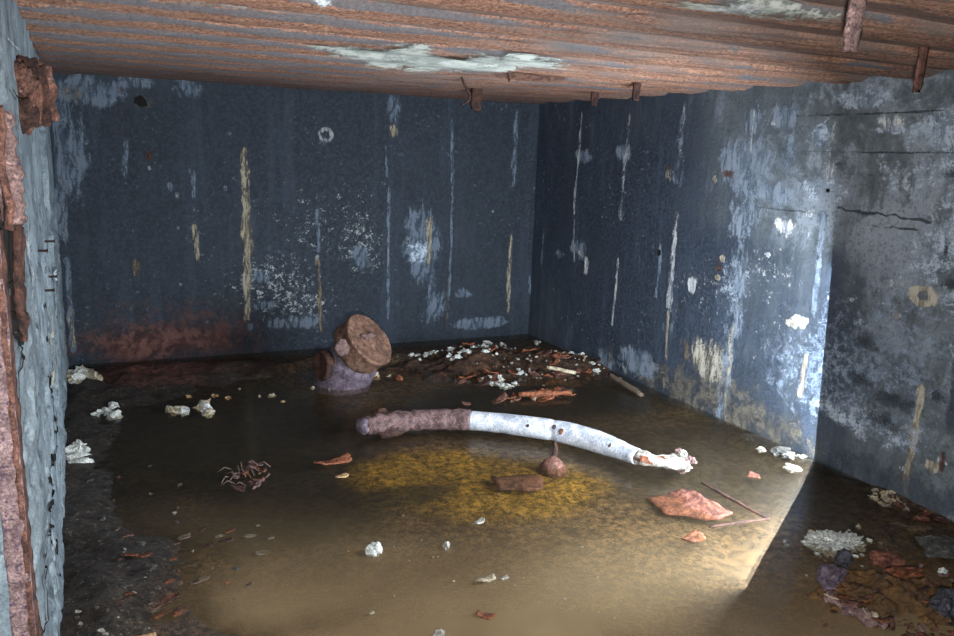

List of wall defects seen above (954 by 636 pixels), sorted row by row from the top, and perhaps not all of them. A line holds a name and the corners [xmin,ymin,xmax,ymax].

rust [14,55,40,134]
leakage [172,80,201,96]
leakage [307,43,564,74]
rust [492,73,566,82]
leakage [230,95,401,332]
leakage [402,119,513,330]
crack [838,207,946,239]
rust [93,316,231,361]
leakage [598,83,954,517]
crack [16,303,62,633]